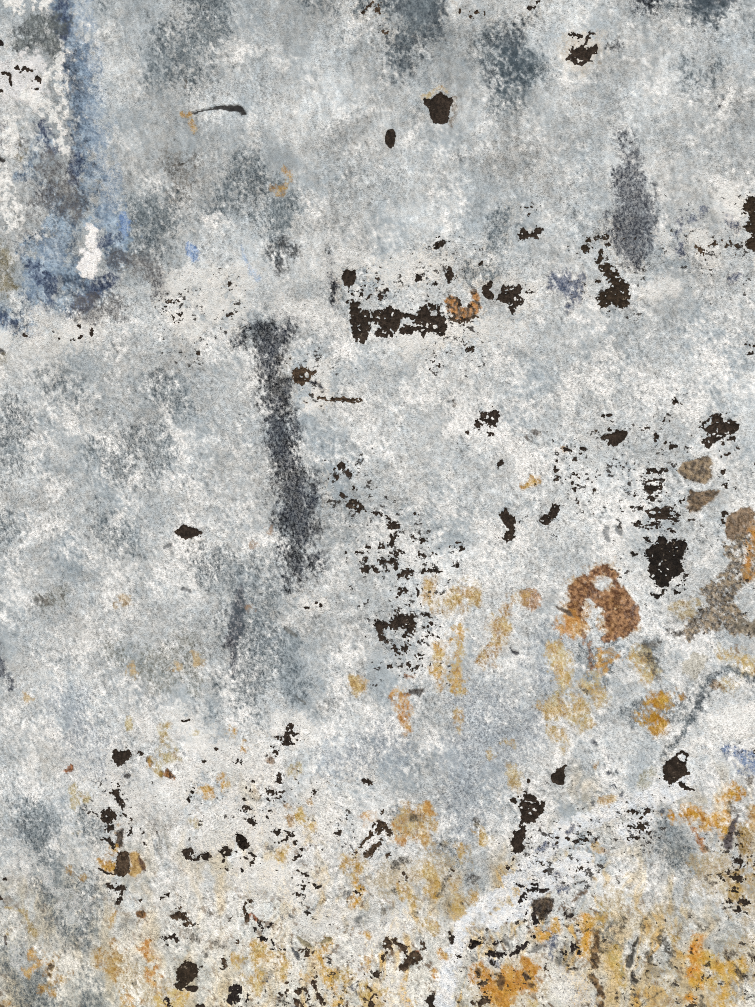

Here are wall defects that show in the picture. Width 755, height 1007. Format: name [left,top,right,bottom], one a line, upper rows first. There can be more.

peeling [342,258,534,371]
peeling [581,229,631,312]
water stain [598,121,724,306]
water stain [717,180,749,224]
water stain [0,139,625,1007]
peeling [325,461,451,676]
rust [417,572,544,736]
rust [532,555,687,757]
peeling [602,413,755,646]
rust [85,905,197,1007]
water stain [380,771,703,1007]
rust [463,778,755,1007]